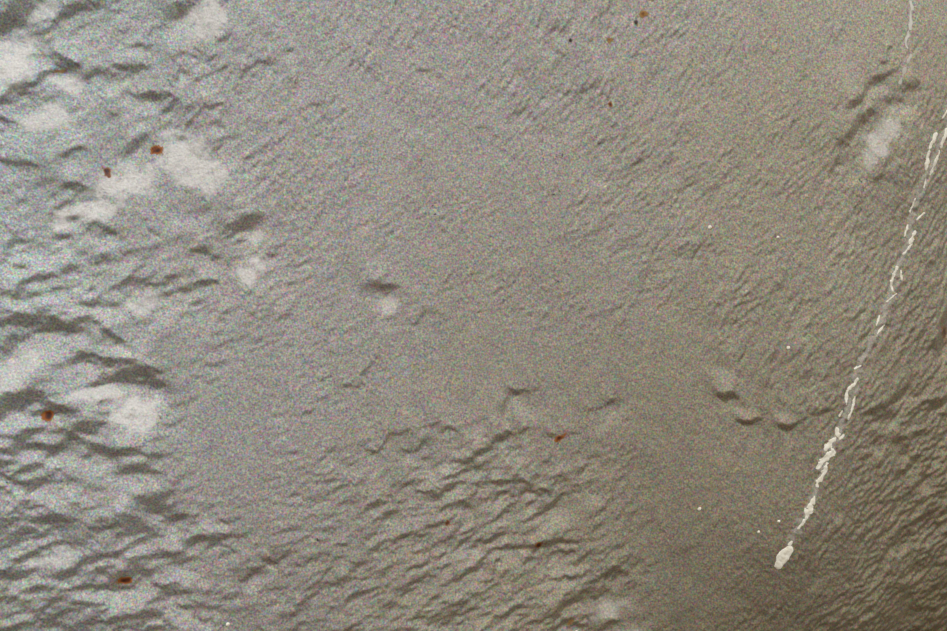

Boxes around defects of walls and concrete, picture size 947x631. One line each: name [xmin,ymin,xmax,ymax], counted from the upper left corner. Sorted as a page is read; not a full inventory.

rust [41,410,54,421]